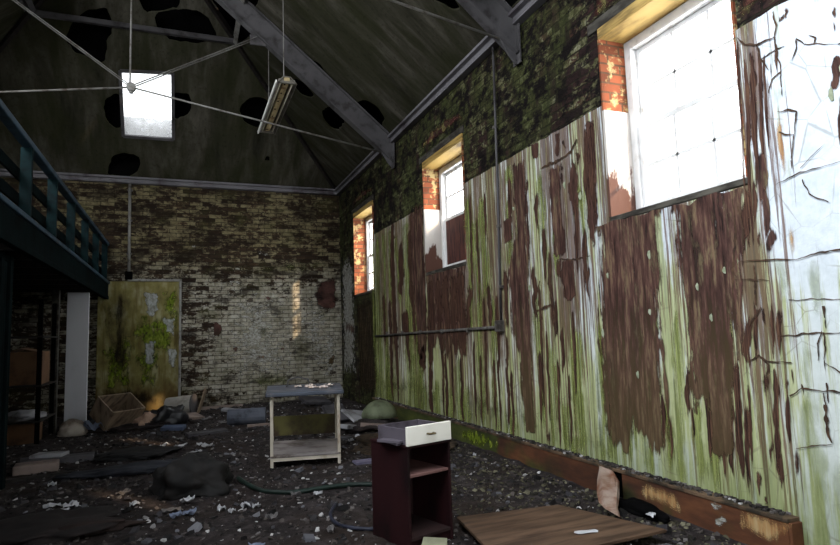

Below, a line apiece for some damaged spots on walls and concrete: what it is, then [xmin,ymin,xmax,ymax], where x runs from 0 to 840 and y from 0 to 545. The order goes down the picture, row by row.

crack [737,12,840,202]
flaking render [411,208,426,351]
leakage [357,198,516,434]
flaking render [504,143,539,433]
leakage [532,298,587,456]
leakage [597,323,657,470]
flaking render [549,121,749,458]
leakage [661,315,720,485]
flaking render [757,153,777,252]
crack [750,355,792,379]
crack [731,200,840,327]
crack [777,298,840,449]